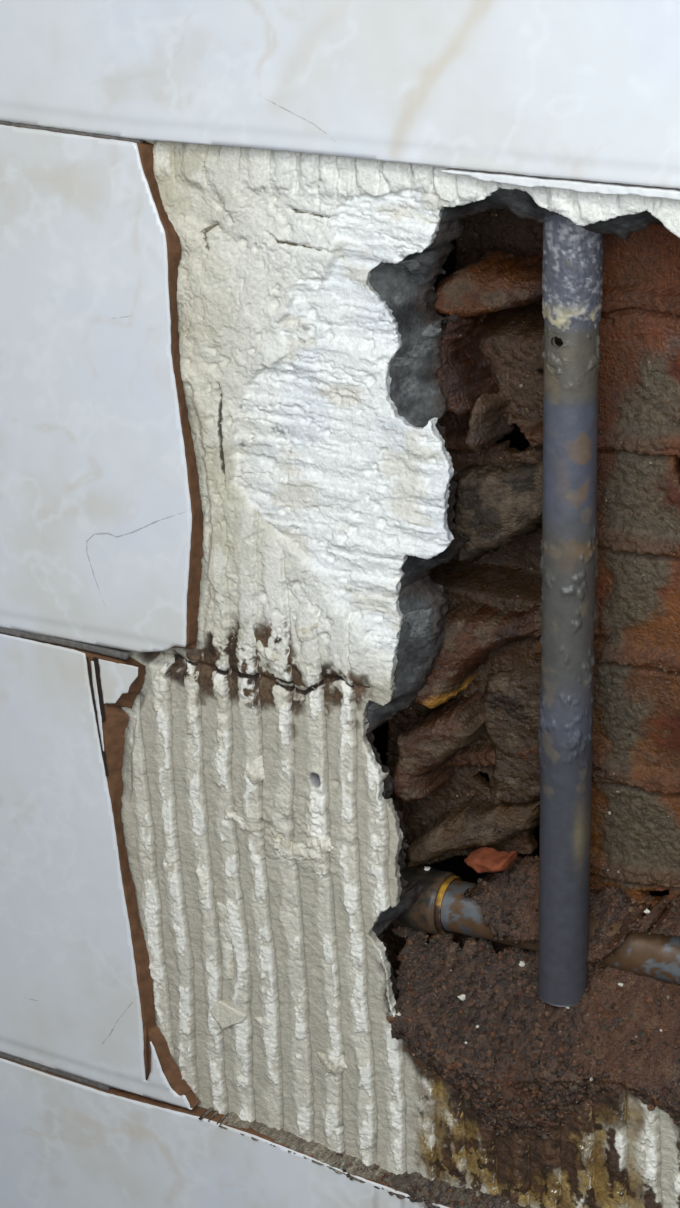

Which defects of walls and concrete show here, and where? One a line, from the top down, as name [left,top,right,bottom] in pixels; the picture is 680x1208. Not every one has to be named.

spalling [387,250,436,307]
spalling [390,315,441,409]
peeling [151,662,169,712]
peeling [184,671,230,756]
peeling [255,645,280,663]
crack [183,657,370,695]
spalling [368,608,433,717]
peeling [244,755,265,786]
peeling [224,810,334,861]
peeling [196,869,234,980]
leakage [420,1074,645,1208]